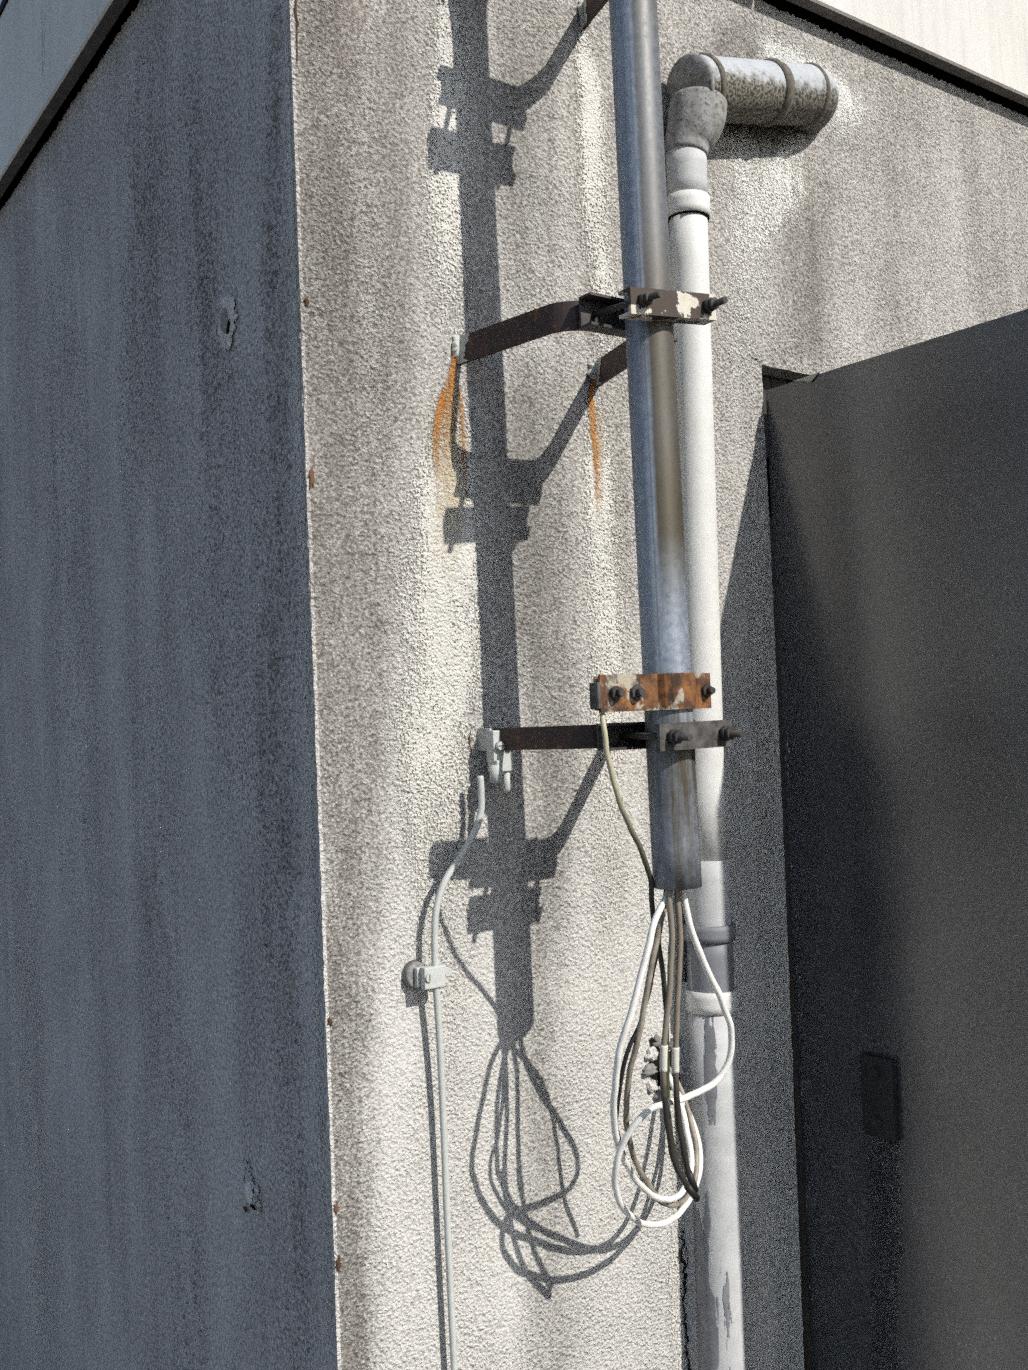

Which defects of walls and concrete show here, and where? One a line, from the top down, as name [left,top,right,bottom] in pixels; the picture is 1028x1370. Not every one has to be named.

rust [428,354,469,571]
rust [588,379,604,509]
crack [679,1226,691,1370]